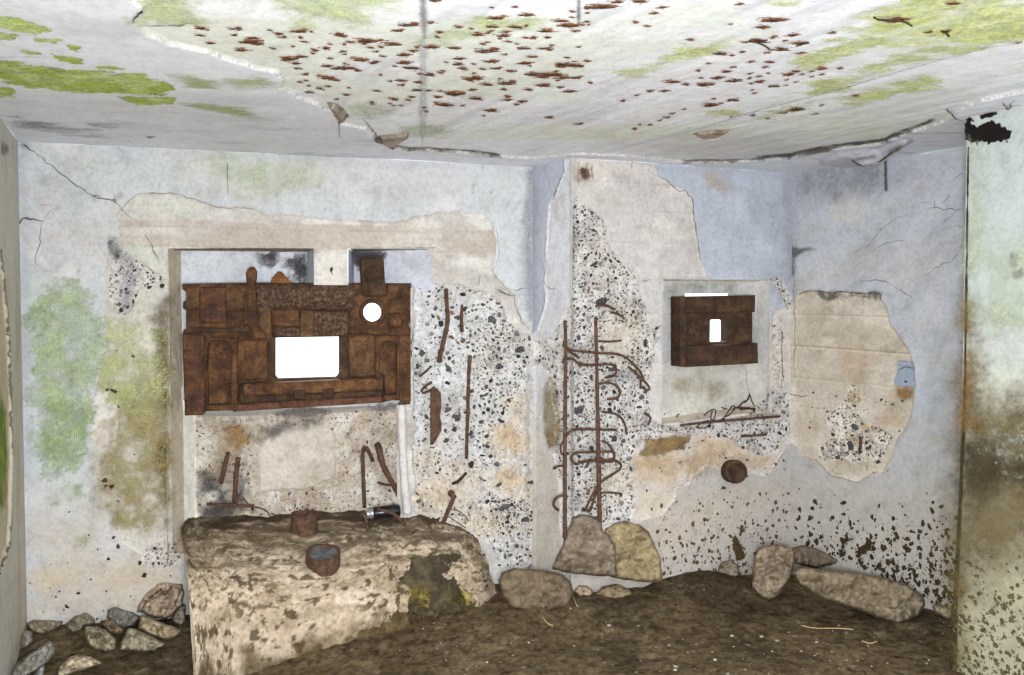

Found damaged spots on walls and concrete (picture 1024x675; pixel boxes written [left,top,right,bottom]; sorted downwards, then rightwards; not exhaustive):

corrosion [226,0,667,117]
flaking render [129,0,1024,163]
corrosion [617,17,844,107]
crack [19,204,56,266]
crack [23,145,314,261]
flaking render [89,158,915,615]
water stain [957,350,981,430]